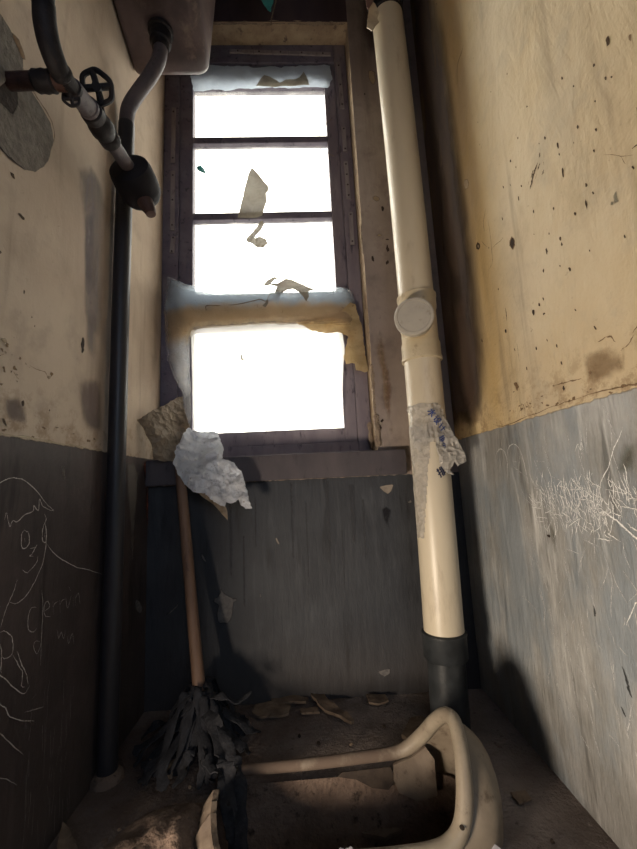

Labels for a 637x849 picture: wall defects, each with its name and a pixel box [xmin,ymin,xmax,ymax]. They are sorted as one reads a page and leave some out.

damp [588,354,619,377]